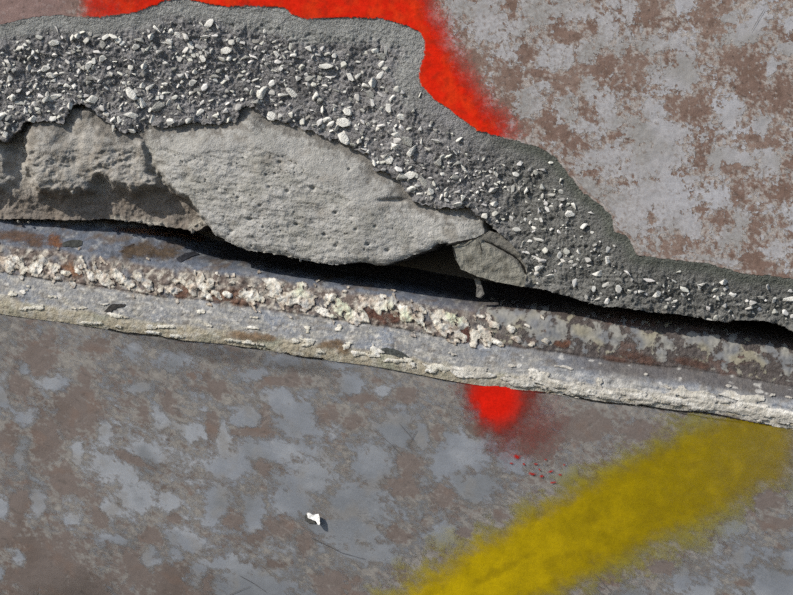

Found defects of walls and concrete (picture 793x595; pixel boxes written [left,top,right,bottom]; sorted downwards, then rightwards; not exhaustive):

spalling [0,0,793,382]
crack [447,238,526,274]
corrosion [364,307,400,324]
corrosion [230,331,275,341]
corrosion [318,339,348,353]
peeling [0,303,793,595]